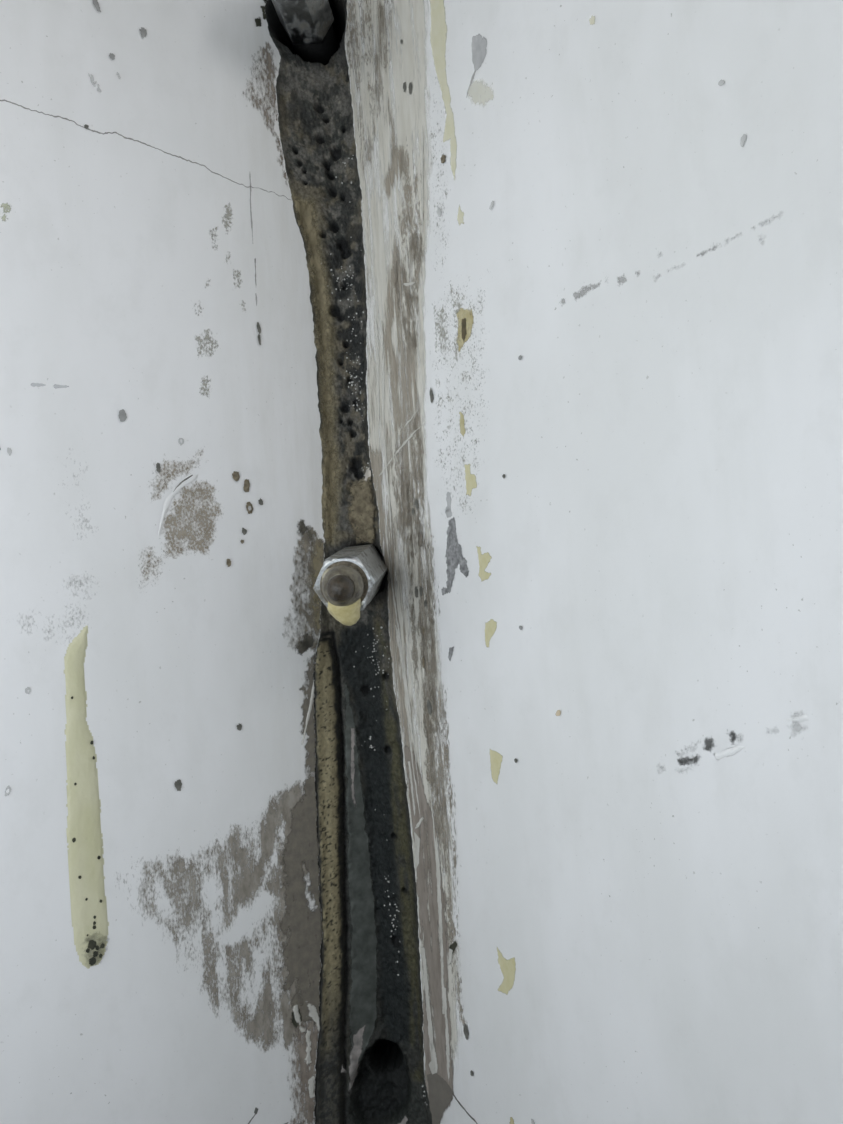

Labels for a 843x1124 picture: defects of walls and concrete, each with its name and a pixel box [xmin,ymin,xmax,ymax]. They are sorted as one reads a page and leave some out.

peeling [466,34,487,98]
crack [0,0,477,1124]
peeling [441,492,469,595]